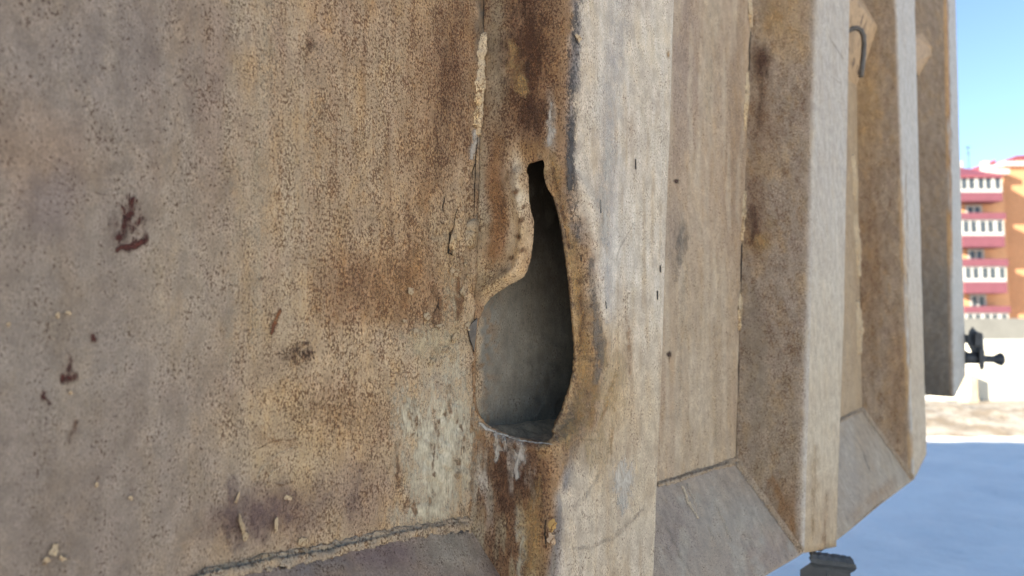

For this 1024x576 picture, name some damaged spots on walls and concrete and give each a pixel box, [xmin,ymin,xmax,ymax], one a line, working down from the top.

corrosion [505,0,555,146]
corrosion [116,195,149,252]
corrosion [551,6,620,460]
corrosion [60,357,78,384]
corrosion [494,433,540,576]